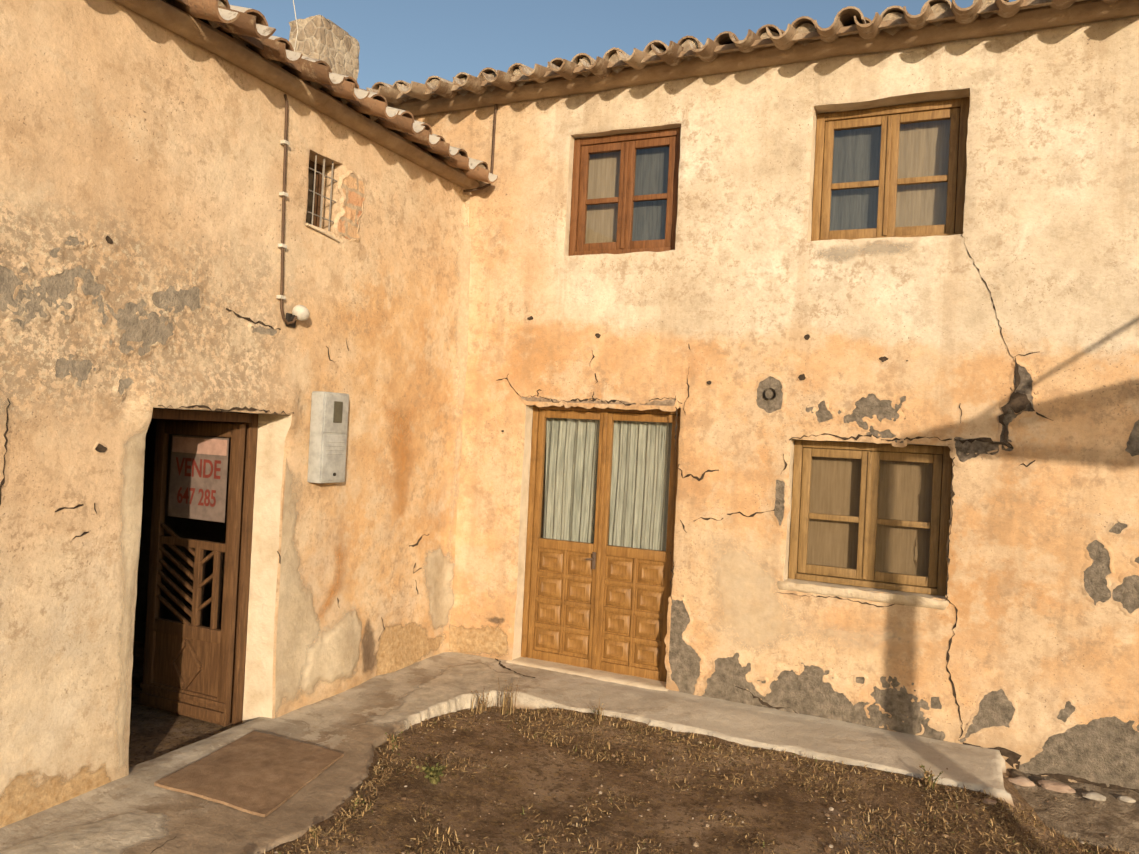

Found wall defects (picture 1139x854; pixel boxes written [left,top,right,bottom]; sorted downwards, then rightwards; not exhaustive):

spalling [0,230,204,402]
crack [226,305,281,330]
crack [496,344,719,481]
spalling [753,373,808,417]
spalling [801,390,909,447]
crack [0,397,15,554]
crack [670,508,775,599]
spalling [770,477,790,528]
crack [775,233,1139,793]
spalling [1080,518,1139,617]
spalling [664,595,1018,744]
spalling [1009,697,1139,790]